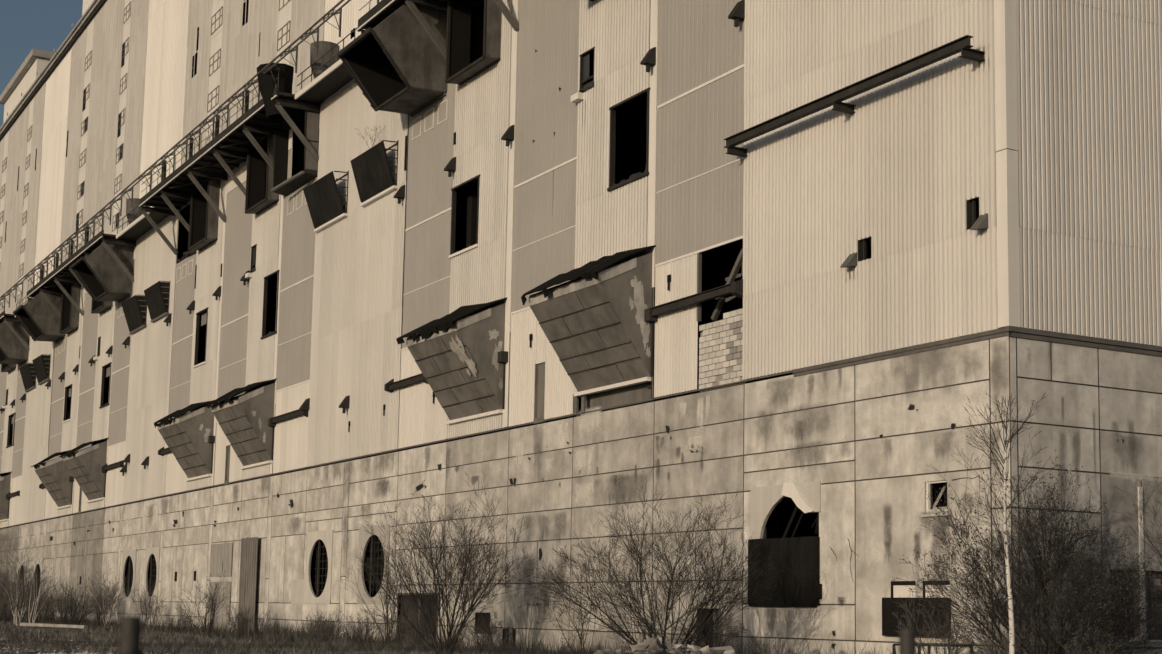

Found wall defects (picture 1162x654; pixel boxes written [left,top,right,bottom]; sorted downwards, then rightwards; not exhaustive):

peeling [629,275,651,358]
peeling [449,335,477,377]
peeling [489,329,503,391]